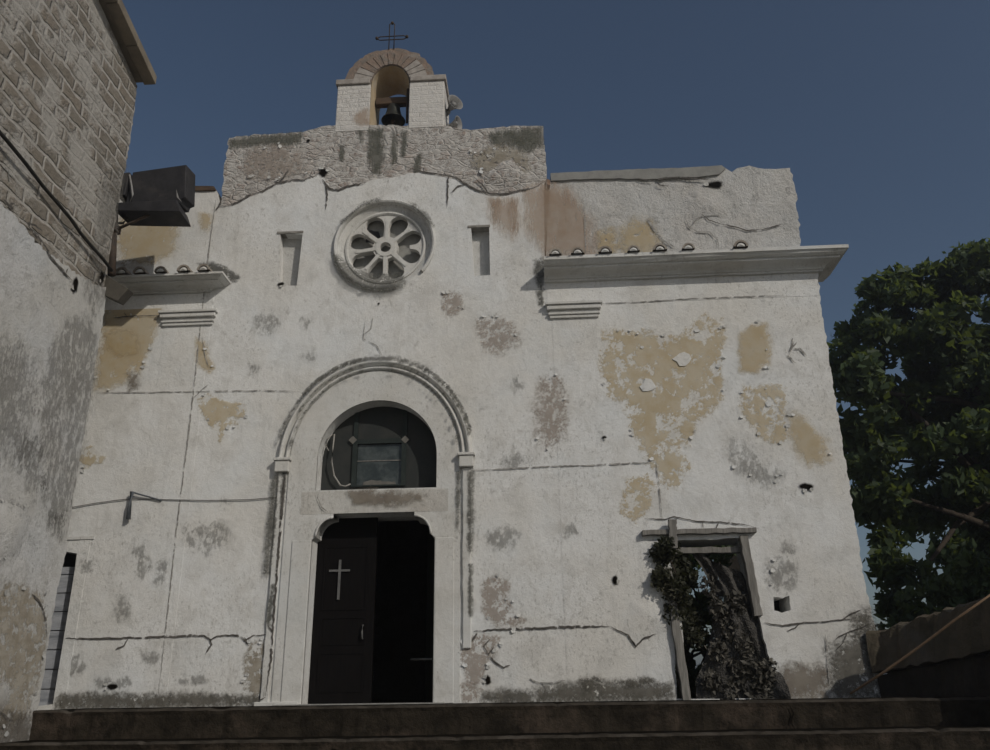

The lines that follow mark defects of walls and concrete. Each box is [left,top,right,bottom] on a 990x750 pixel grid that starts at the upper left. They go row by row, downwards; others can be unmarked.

crack [406,166,543,205]
crack [646,215,781,247]
flaking render [94,308,160,390]
flaking render [739,320,770,372]
flaking render [199,393,247,442]
flaking render [600,314,727,524]
flaking render [740,384,832,463]
crack [70,292,299,701]
crack [32,594,48,634]
crack [471,625,655,668]
crack [768,610,867,684]
leakage [0,714,32,743]